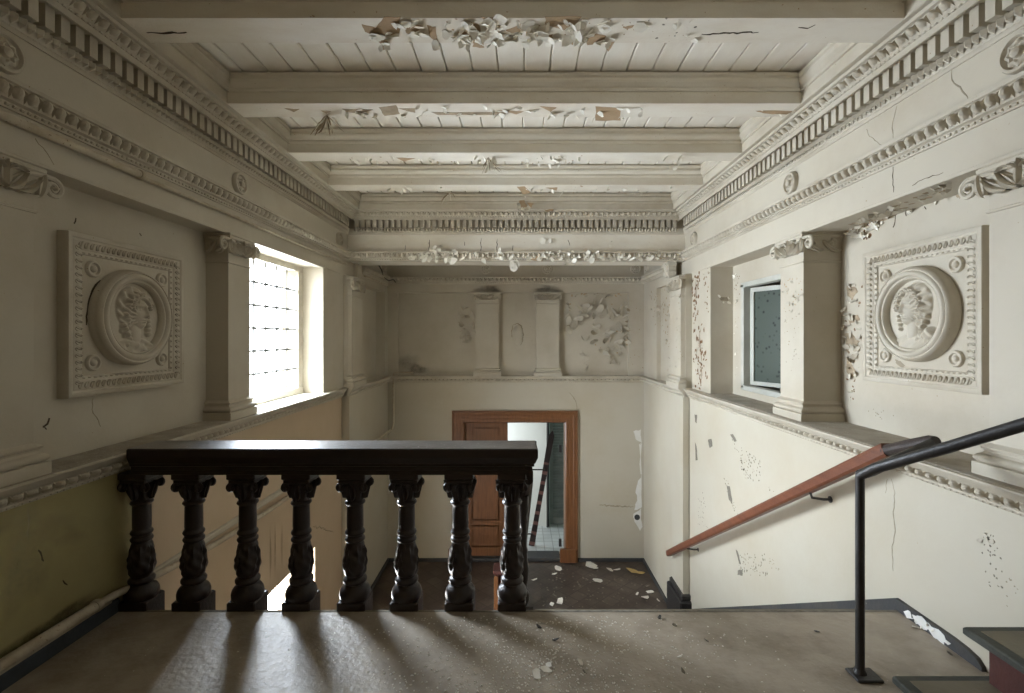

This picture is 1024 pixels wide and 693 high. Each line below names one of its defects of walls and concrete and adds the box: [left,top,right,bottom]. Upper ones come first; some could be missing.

peeling [362,14,658,52]
crack [951,70,968,99]
peeling [321,105,643,122]
flaking render [843,185,961,240]
peeling [408,237,685,272]
peeling [562,271,740,389]
peeling [840,283,863,402]
flaking render [633,430,642,530]
crack [885,479,896,568]
spalling [736,550,779,576]